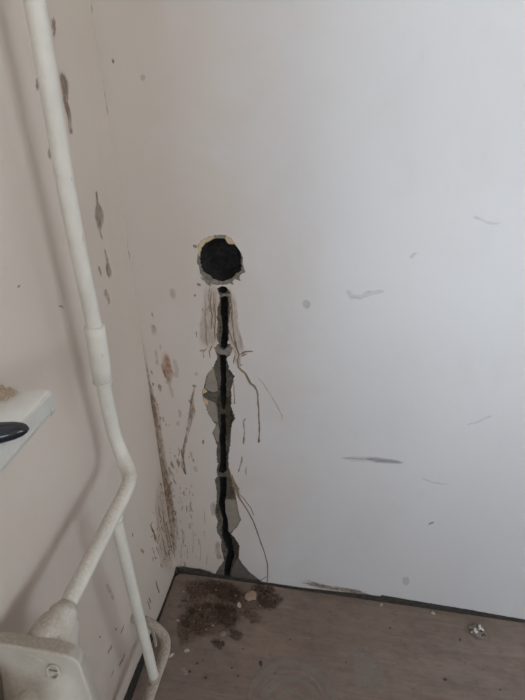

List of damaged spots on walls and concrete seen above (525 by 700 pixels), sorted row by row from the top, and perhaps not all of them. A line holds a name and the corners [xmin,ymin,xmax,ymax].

damp [159,385,196,532]
spalling [193,234,245,575]
crack [228,469,268,583]
crack [237,366,277,443]